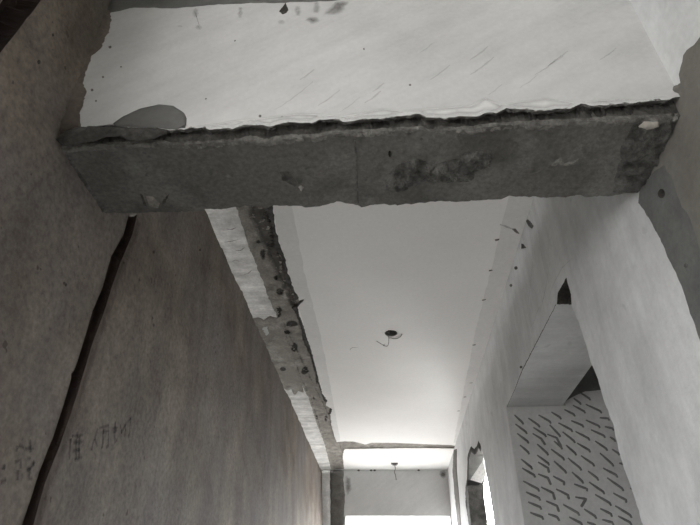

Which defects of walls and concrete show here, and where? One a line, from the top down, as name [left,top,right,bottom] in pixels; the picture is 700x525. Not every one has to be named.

flaking render [56,97,678,153]
spalling [386,150,492,193]
peeling [236,206,488,525]